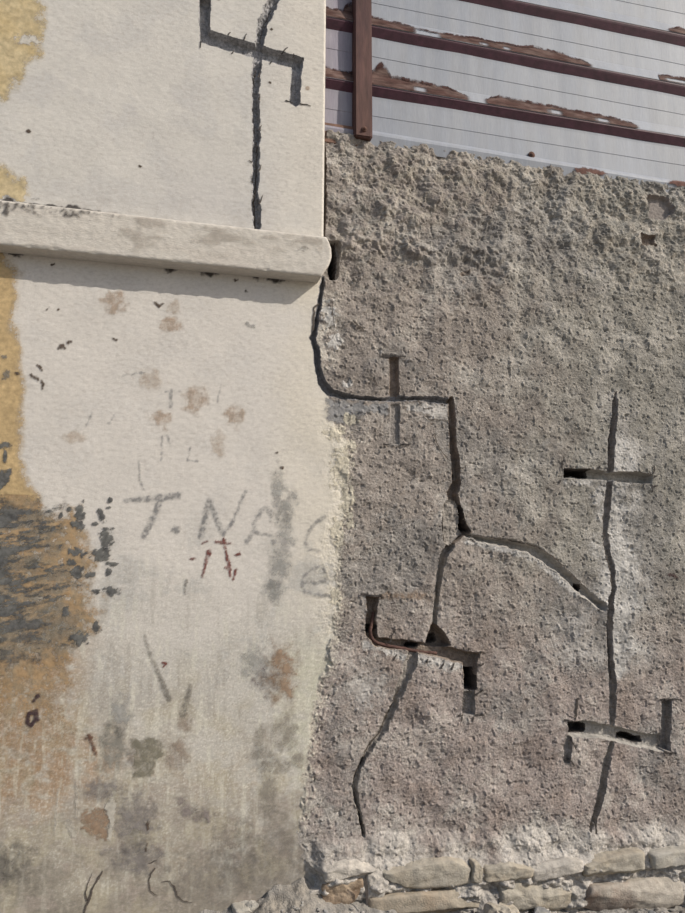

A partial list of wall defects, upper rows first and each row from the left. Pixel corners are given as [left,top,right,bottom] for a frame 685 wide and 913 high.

corrosion [326,2,353,21]
peeling [0,0,46,101]
corrosion [325,66,353,81]
corrosion [372,62,469,100]
corrosion [372,16,592,67]
corrosion [658,74,685,84]
crack [249,0,280,229]
corrosion [486,95,638,128]
peeling [0,252,121,739]
crack [309,276,619,838]
damp [243,649,297,702]
damp [102,703,184,777]